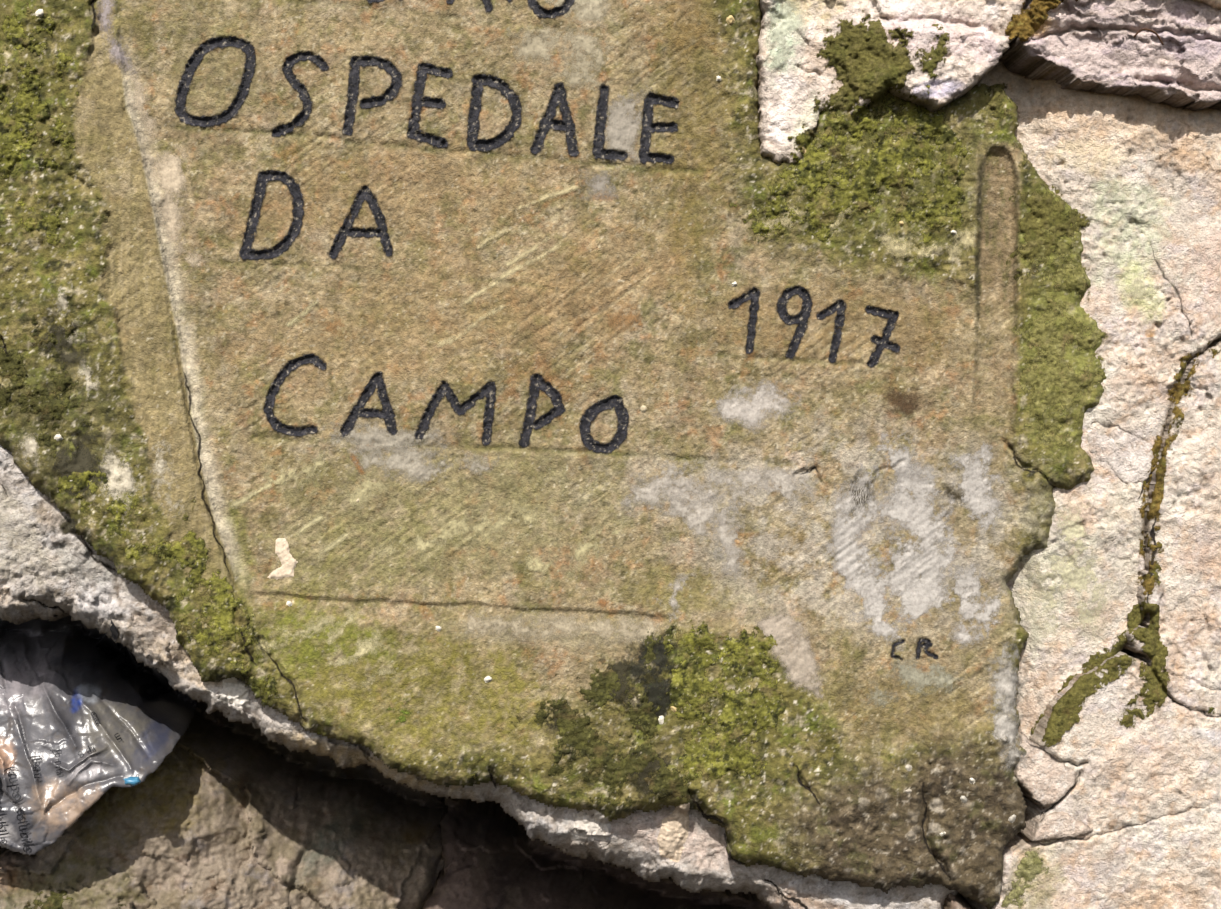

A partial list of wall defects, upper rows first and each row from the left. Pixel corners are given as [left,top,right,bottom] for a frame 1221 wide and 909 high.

crack [1154,257,1191,329]
damp [717,384,790,429]
damp [888,391,917,414]
damp [625,464,812,575]
damp [827,434,1002,643]
crack [1139,466,1157,603]
damp [670,575,687,621]
damp [468,615,677,720]
damp [758,614,822,697]
damp [897,658,953,691]
crack [1167,688,1221,717]
damp [632,754,671,798]